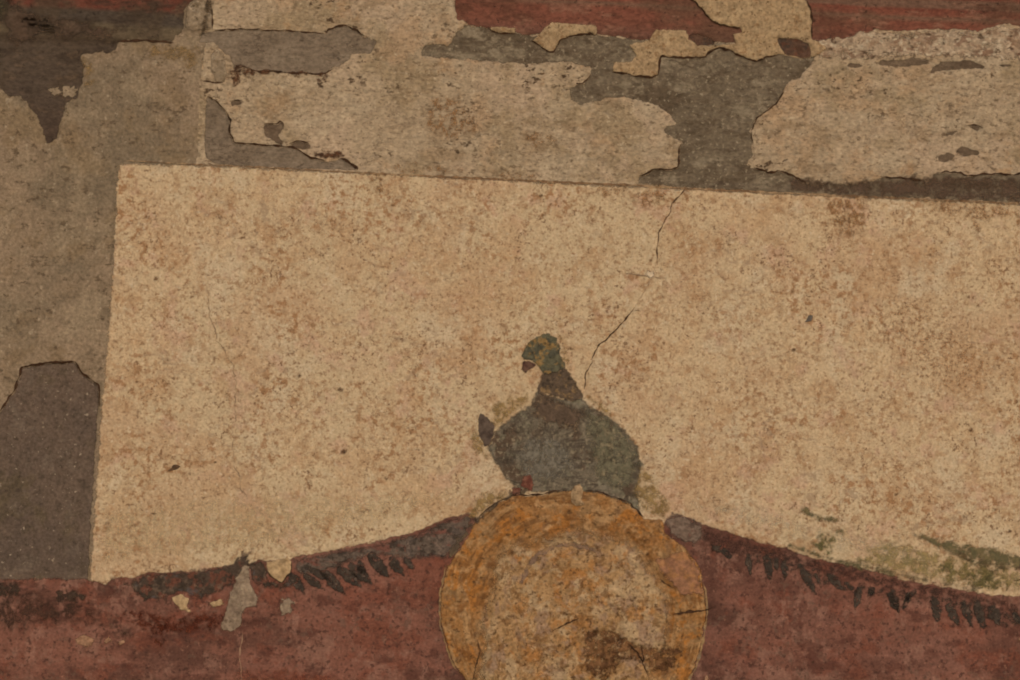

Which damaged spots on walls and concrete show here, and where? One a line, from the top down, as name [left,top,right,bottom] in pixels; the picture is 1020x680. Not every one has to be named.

peeling [205,96,358,170]
peeling [199,24,377,75]
peeling [421,25,1020,202]
crack [128,160,1020,389]
peeling [0,361,100,603]
peeling [123,550,295,615]